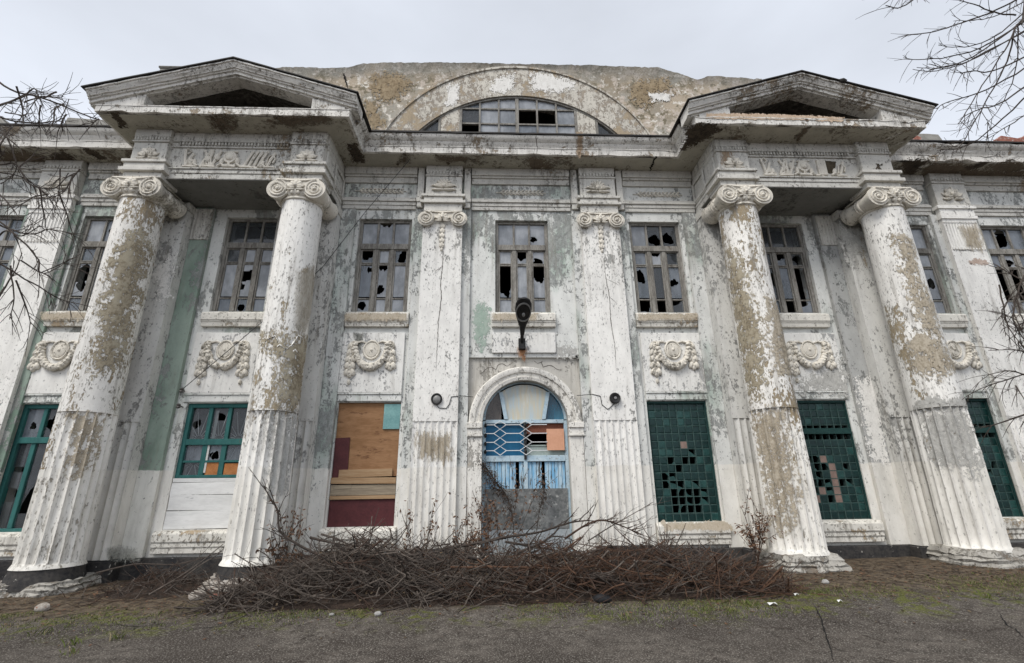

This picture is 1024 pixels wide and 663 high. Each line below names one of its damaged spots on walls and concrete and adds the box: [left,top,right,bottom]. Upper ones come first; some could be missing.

spalling [361,70,418,130]
spalling [444,83,460,107]
spalling [487,71,579,95]
spalling [626,76,676,110]
peeling [62,409,105,481]
peeling [85,224,179,381]
peeling [258,329,308,501]
crack [435,260,443,363]
peeling [725,244,890,538]
peeling [891,232,986,484]